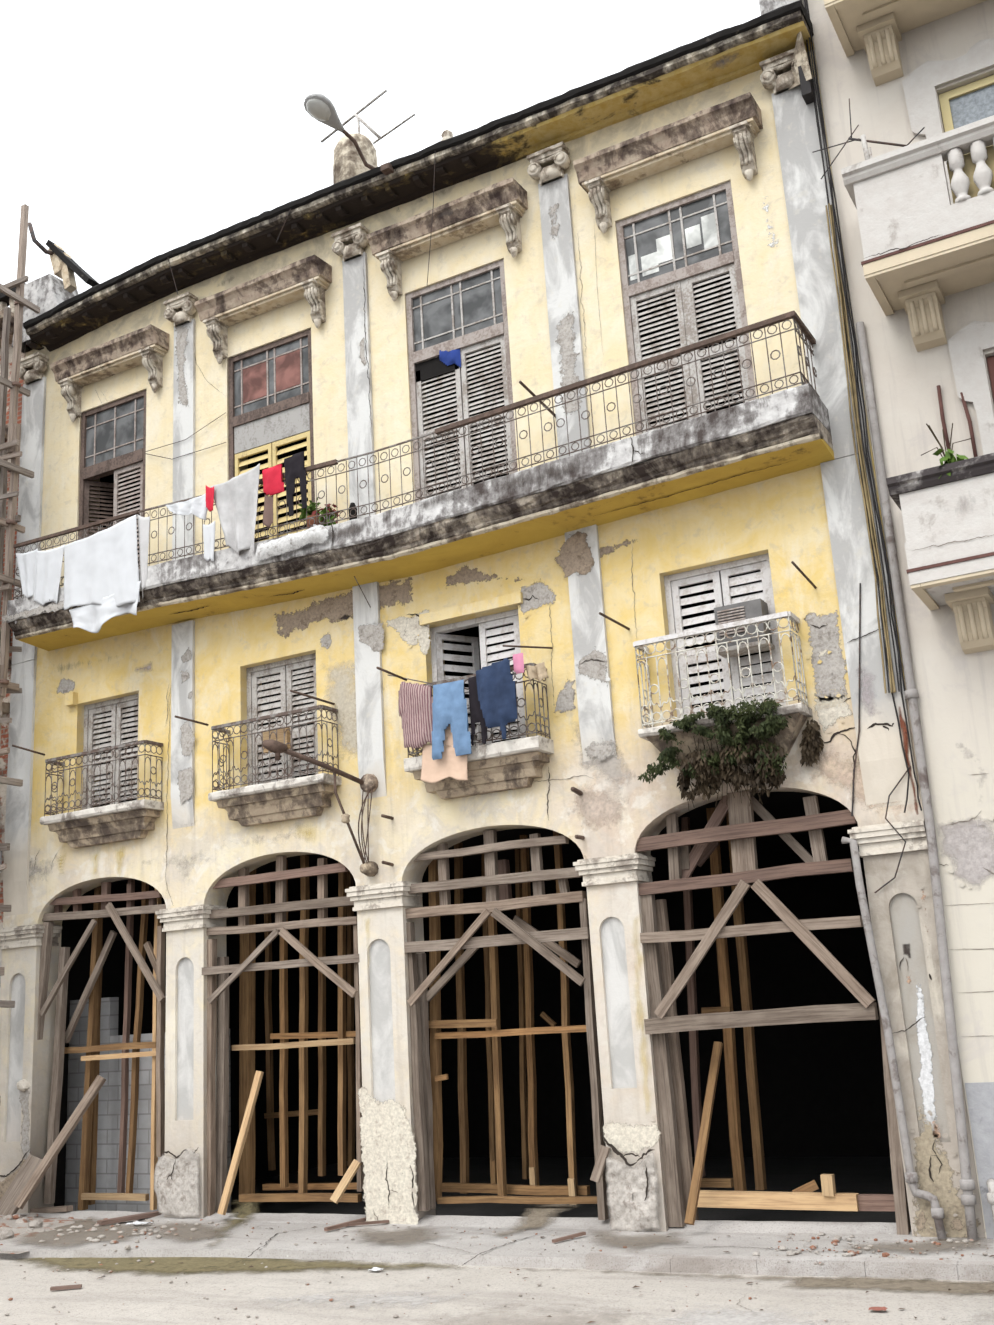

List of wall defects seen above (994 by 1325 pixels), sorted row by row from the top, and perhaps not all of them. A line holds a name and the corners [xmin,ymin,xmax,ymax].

damp [332,524,361,537]
peeling [555,531,635,578]
peeling [274,577,431,655]
peeling [446,565,556,618]
peeling [554,646,610,717]
peeling [802,610,872,733]
peeling [585,740,616,762]
peeling [939,816,994,889]
spalling [357,1087,419,1225]
spalling [603,1117,661,1155]